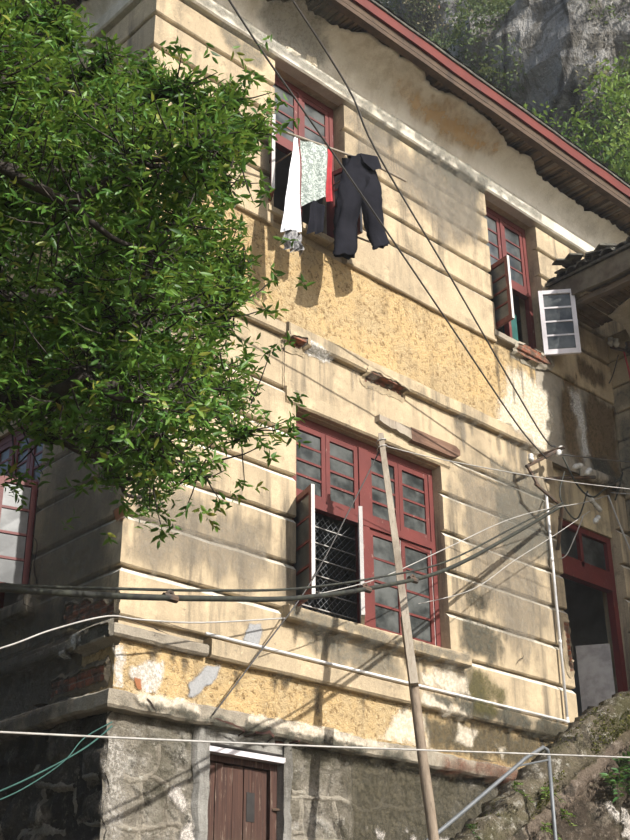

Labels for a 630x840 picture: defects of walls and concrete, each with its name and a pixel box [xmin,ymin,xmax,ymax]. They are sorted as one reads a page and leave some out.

damp [495,346,553,463]
damp [562,357,630,485]
flaking render [34,590,163,707]
damp [294,608,406,671]
damp [413,459,568,746]